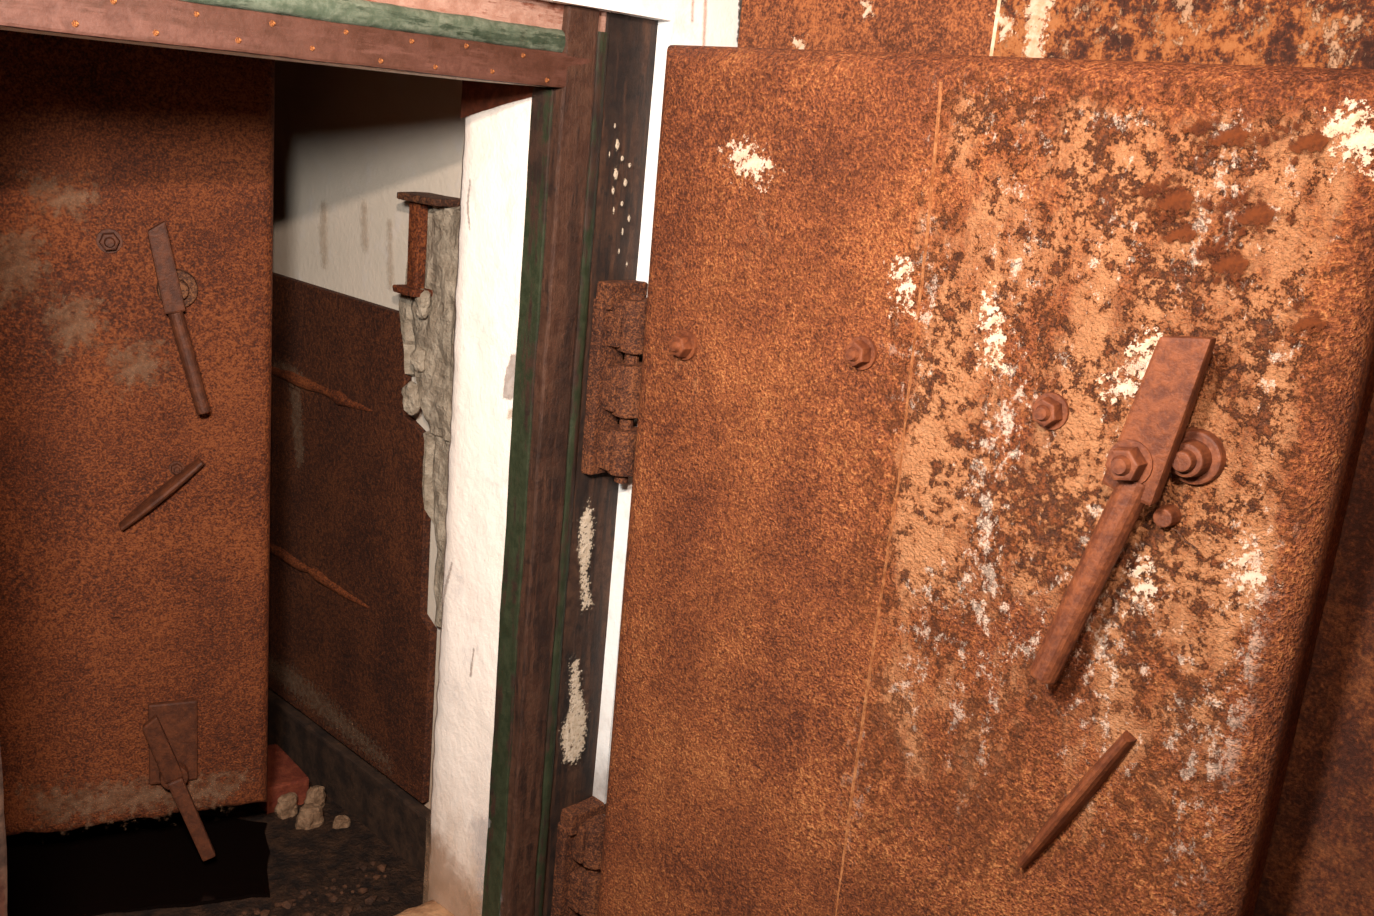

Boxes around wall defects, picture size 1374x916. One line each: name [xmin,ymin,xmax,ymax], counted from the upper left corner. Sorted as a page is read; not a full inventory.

corrosion [1161,102,1349,166]
corrosion [1132,171,1295,291]
corrosion [1276,297,1326,344]
spalling [398,205,460,627]